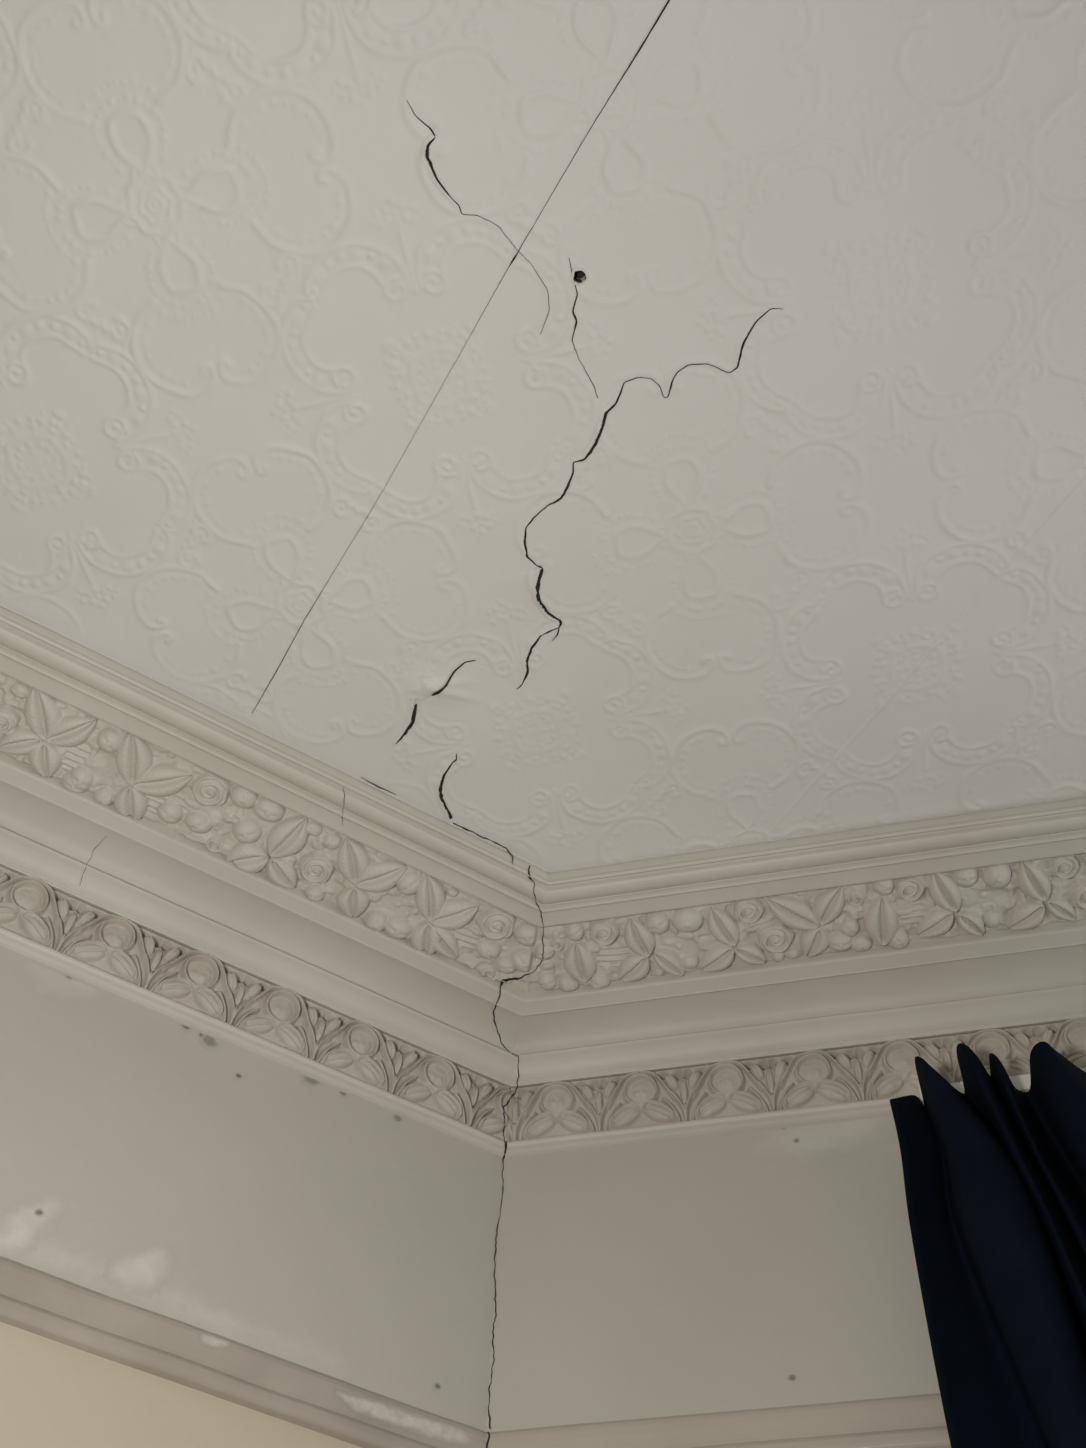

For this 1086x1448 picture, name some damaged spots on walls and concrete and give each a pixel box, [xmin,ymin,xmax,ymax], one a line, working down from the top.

crack [407,101,781,689]
crack [391,660,476,744]
crack [435,754,544,1448]